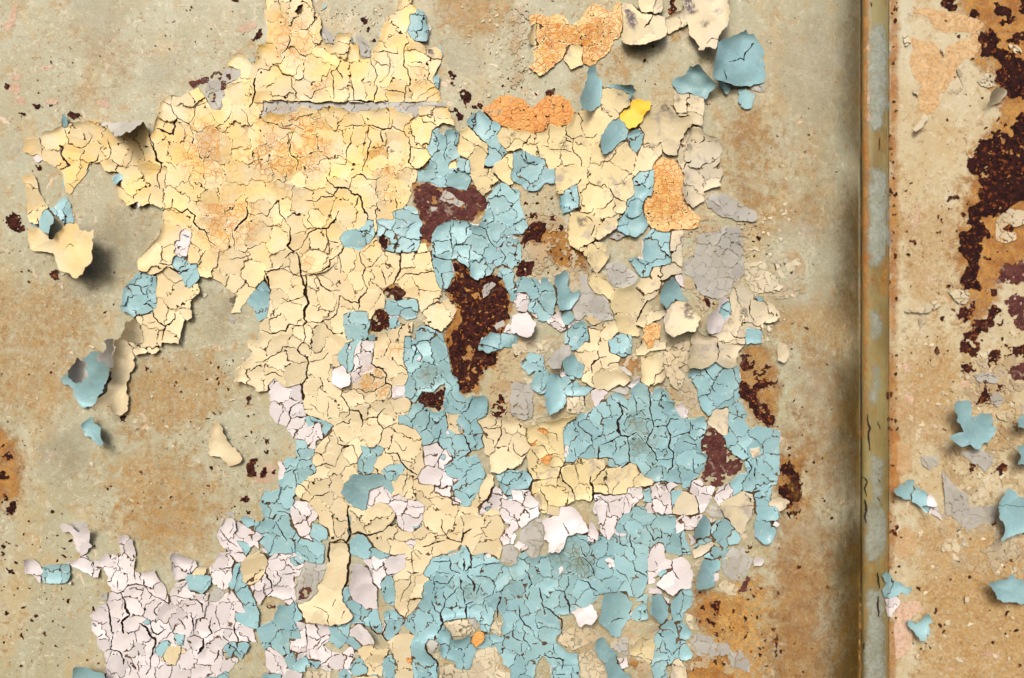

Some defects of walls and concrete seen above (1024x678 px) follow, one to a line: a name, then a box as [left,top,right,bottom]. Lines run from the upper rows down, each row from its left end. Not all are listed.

peeling [903,8,984,131]
crack [60,36,706,675]
peeling [22,0,806,678]
corrosion [412,182,488,246]
corrosion [418,262,512,418]
corrosion [738,346,788,428]
peeling [871,313,882,338]
corrosion [886,0,1024,543]
corrosion [701,428,743,487]
corrosion [776,446,823,519]
peeling [864,348,1024,661]
peeling [863,572,975,678]